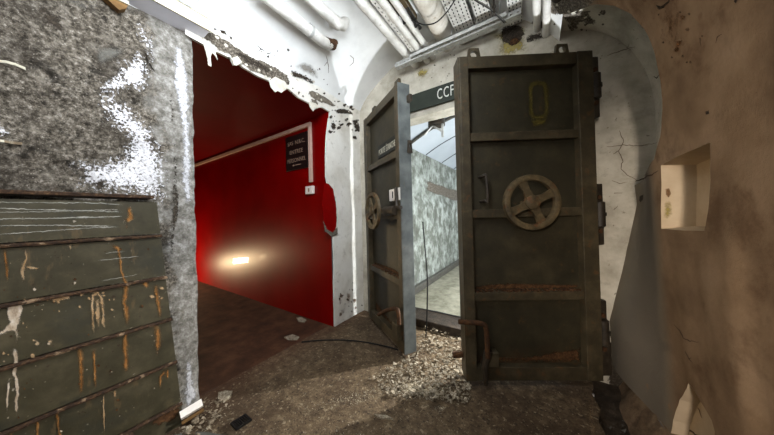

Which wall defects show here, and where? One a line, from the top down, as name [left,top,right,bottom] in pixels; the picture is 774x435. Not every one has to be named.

spalling [202,28,360,139]
water stain [73,23,191,250]
crack [607,131,657,184]
corrosion [79,292,113,336]
corrosion [105,245,129,319]
water stain [186,362,196,405]